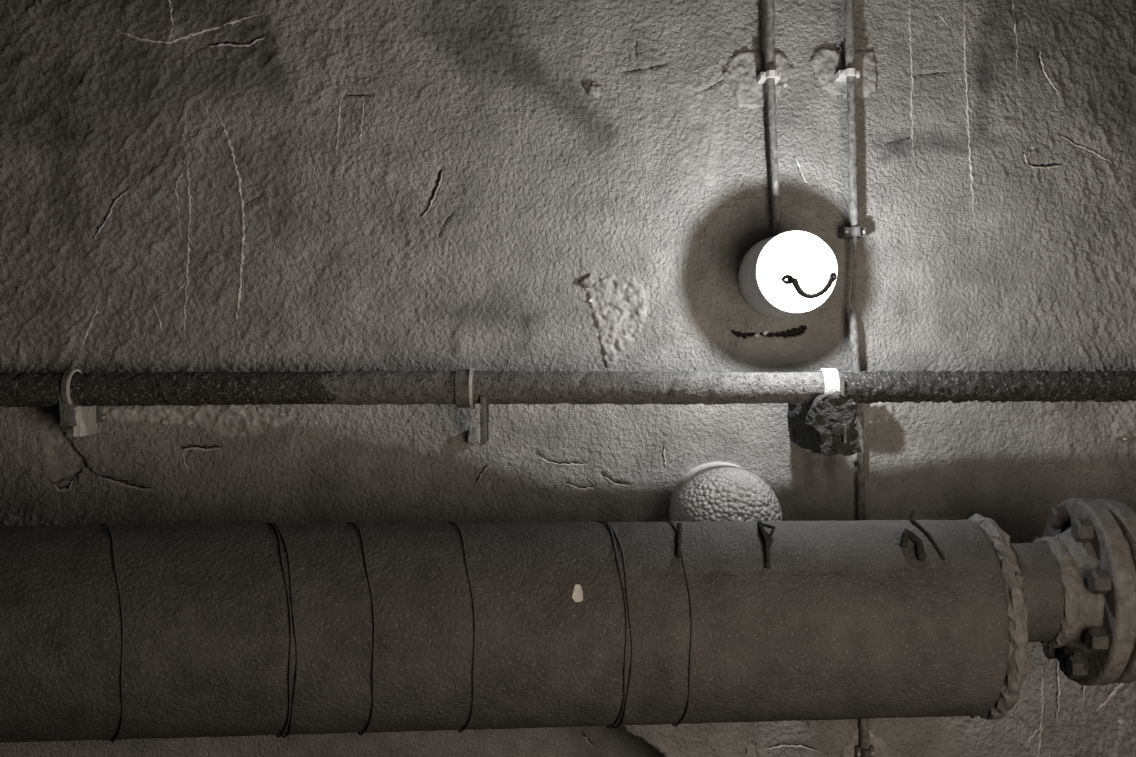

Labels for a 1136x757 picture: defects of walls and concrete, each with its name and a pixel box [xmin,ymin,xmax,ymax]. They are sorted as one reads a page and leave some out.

crack [117,0,265,47]
crack [1012,0,1059,96]
crack [886,0,975,228]
crack [1023,135,1112,169]
crack [152,162,191,335]
crack [184,107,264,335]
crack [420,169,454,236]
crack [79,298,100,350]
flaking render [578,273,649,367]